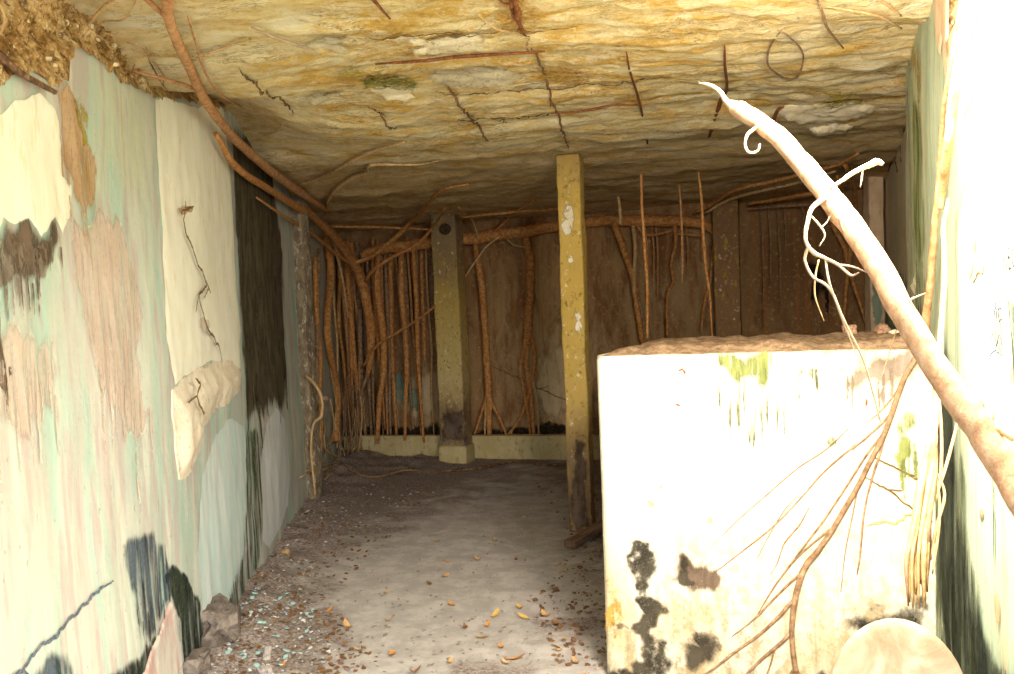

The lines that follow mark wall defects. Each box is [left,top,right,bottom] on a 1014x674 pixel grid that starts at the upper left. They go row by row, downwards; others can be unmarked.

spalling [0,0,227,237]
crack [239,69,293,113]
rust [375,0,545,65]
crack [375,26,670,148]
peeling [933,0,959,78]
damp [0,84,153,510]
damp [994,291,1014,378]
damp [718,350,785,454]
damp [609,540,671,674]
damp [677,553,720,591]
damp [686,633,720,670]
damp [850,402,1006,674]